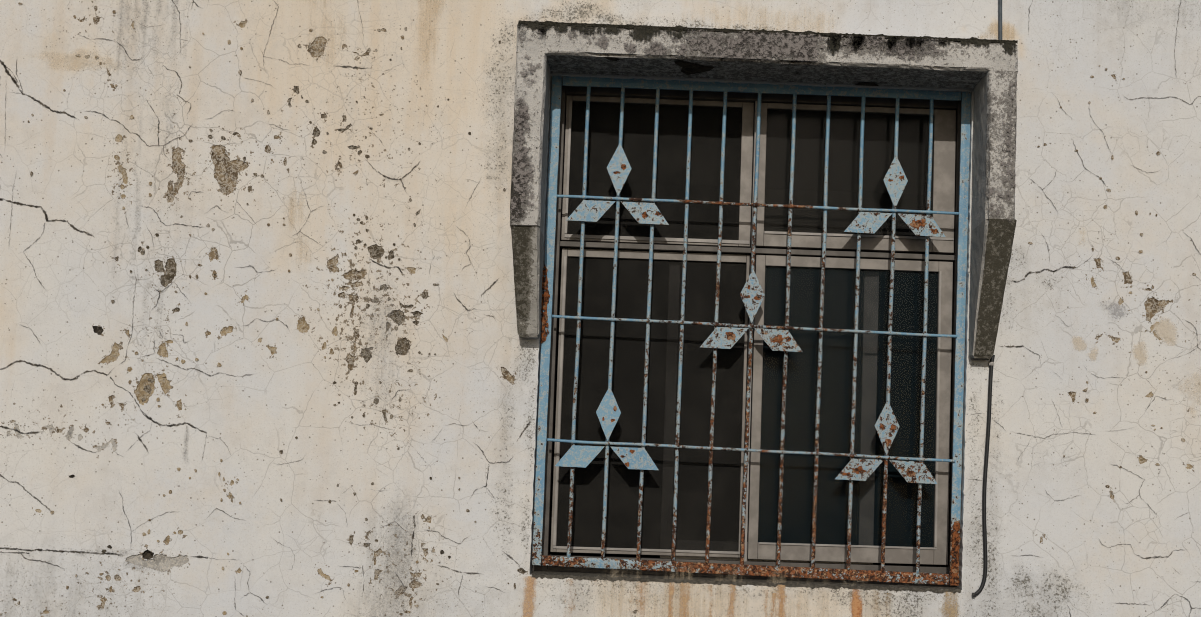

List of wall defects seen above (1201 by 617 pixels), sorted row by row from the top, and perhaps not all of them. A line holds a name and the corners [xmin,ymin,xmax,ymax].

crack [0,60,191,146]
spalling [149,139,192,202]
spalling [208,129,264,205]
damp [485,1,948,221]
damp [987,65,1018,221]
spalling [130,233,219,288]
spalling [322,214,439,422]
rust [540,261,550,343]
crack [0,277,252,455]
crack [0,494,132,567]
rust [523,576,535,617]
rust [851,589,862,617]